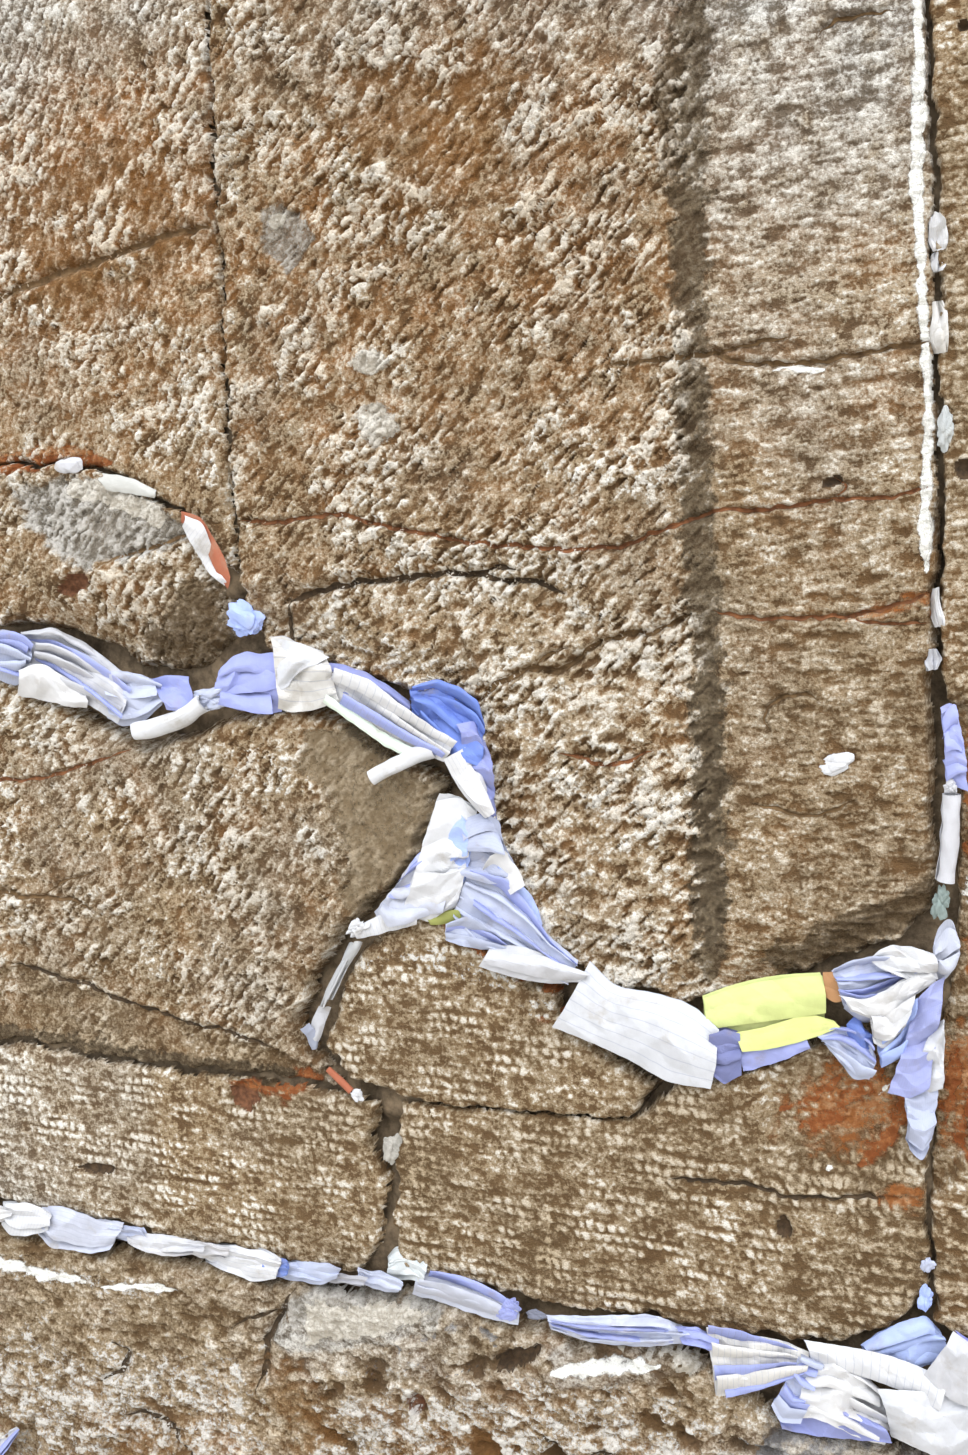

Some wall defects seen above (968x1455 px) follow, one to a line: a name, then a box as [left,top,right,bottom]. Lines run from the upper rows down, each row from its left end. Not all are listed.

crack [0,225,213,318]
crack [238,478,928,641]
crack [480,592,932,702]
crack [673,1177,924,1201]